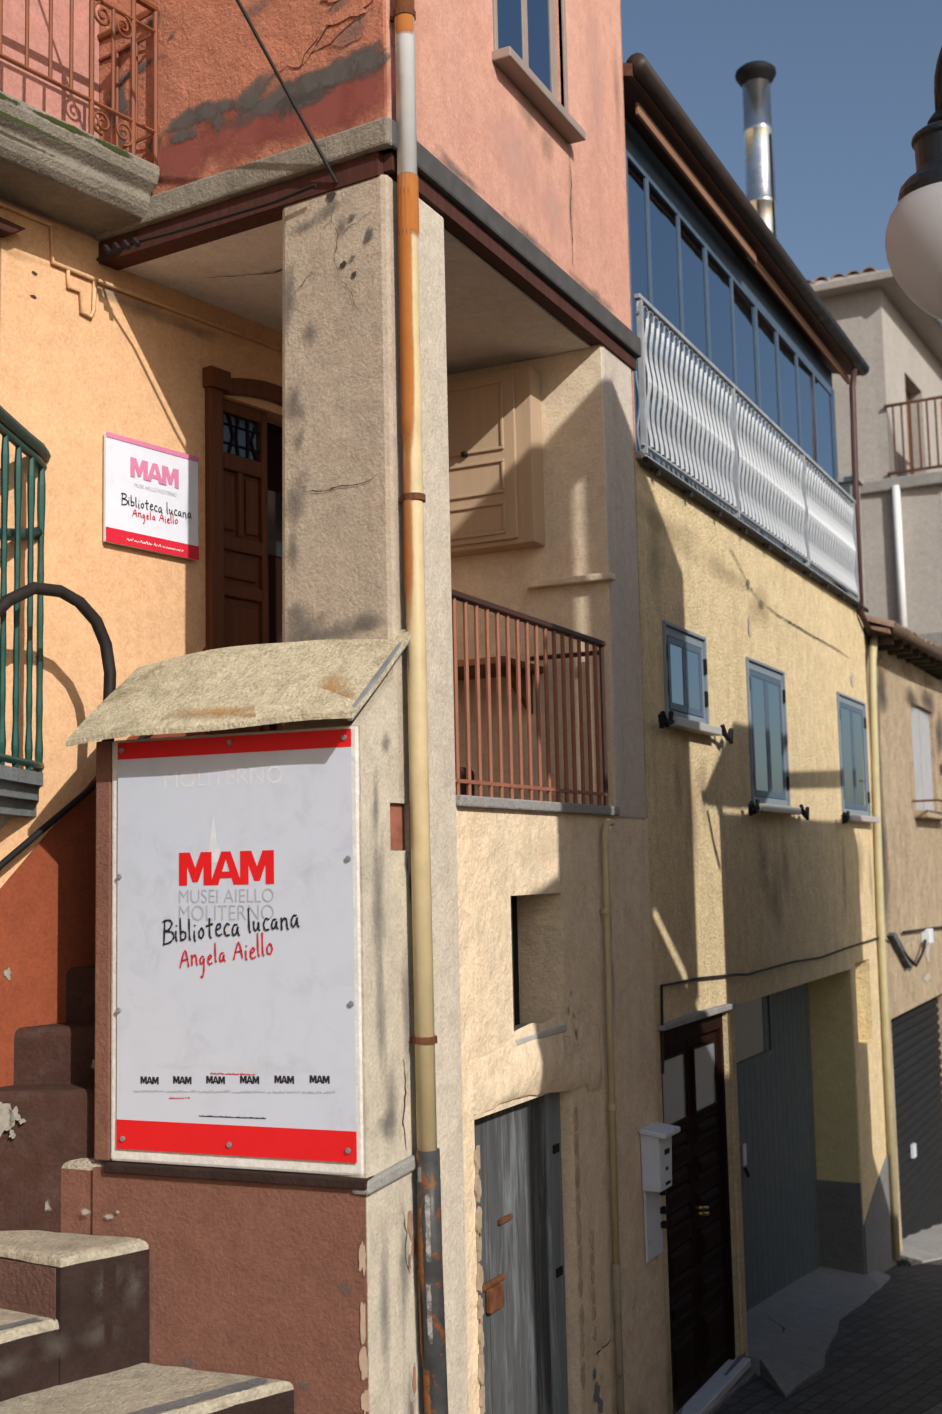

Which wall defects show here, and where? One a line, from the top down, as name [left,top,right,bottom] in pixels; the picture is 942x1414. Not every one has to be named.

crack [269,2,374,80]
peeling [0,1102,26,1139]
rust [417,1208,431,1414]